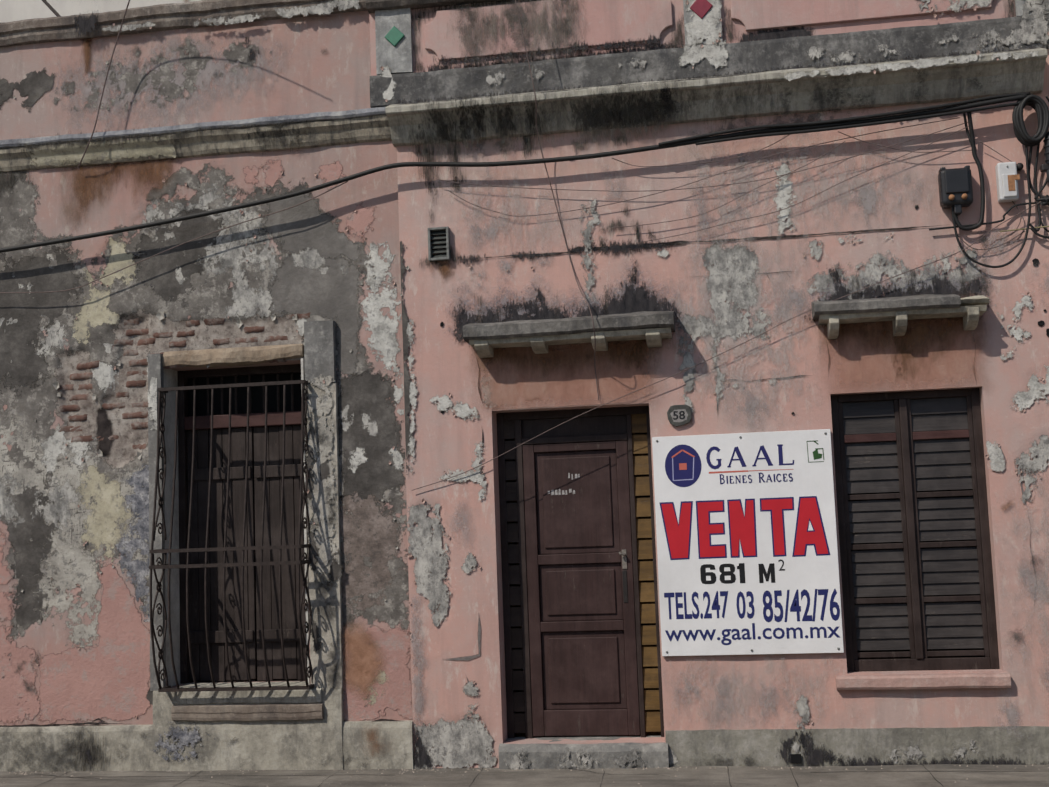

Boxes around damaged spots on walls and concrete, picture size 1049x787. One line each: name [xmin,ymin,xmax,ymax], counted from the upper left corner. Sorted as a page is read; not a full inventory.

water stain [0,36,264,114]
water stain [412,0,684,72]
peeling [784,0,1049,81]
water stain [394,45,1038,194]
water stain [421,248,488,276]
water stain [449,198,682,347]
water stain [804,235,990,305]
peeling [677,242,771,424]
peeling [0,136,488,687]
peeling [1011,365,1049,412]
peeling [985,435,1049,509]
peeling [413,681,497,769]